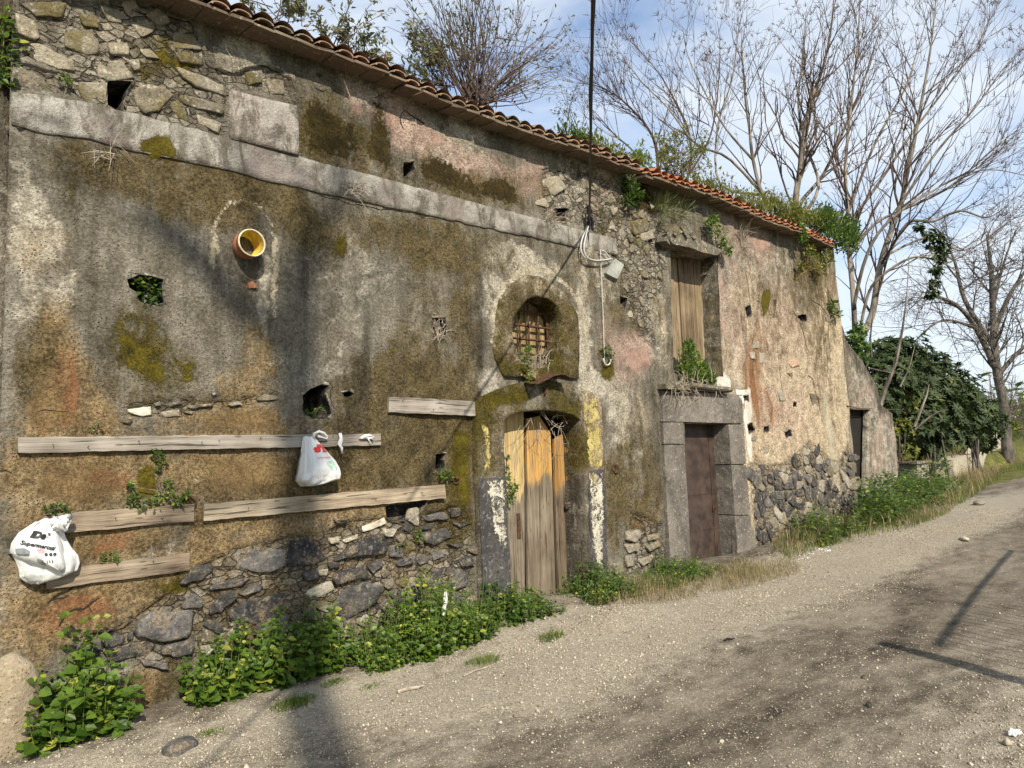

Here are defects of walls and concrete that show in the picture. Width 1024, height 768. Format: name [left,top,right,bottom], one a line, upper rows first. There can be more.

spalling [104,80,134,111]
spalling [554,208,569,224]
spalling [127,273,167,309]
spalling [300,381,354,419]
corrosion [750,358,773,425]
peeling [583,398,604,564]
peeling [488,480,507,548]